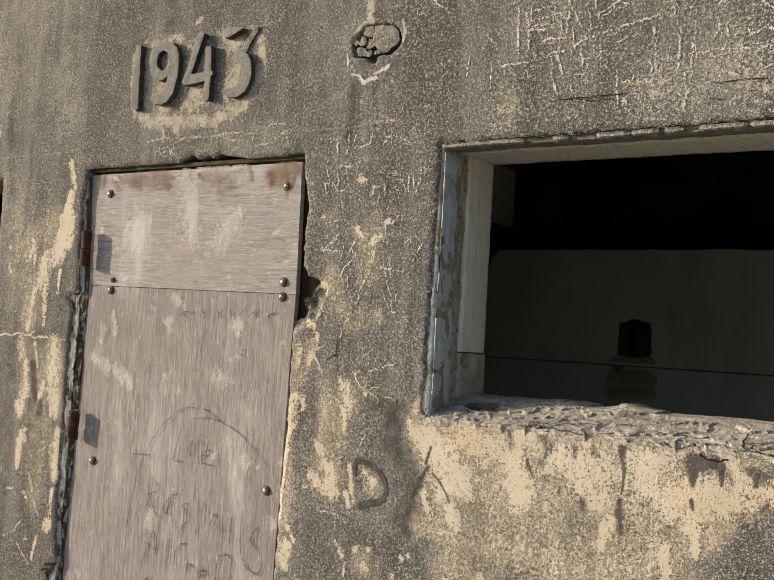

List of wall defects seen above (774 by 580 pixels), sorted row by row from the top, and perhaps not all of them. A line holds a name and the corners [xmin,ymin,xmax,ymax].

leakage [30,360,43,418]
leakage [525,435,552,477]
leakage [615,445,627,536]
crack [516,414,774,462]
leakage [683,453,726,488]
leakage [746,466,768,489]